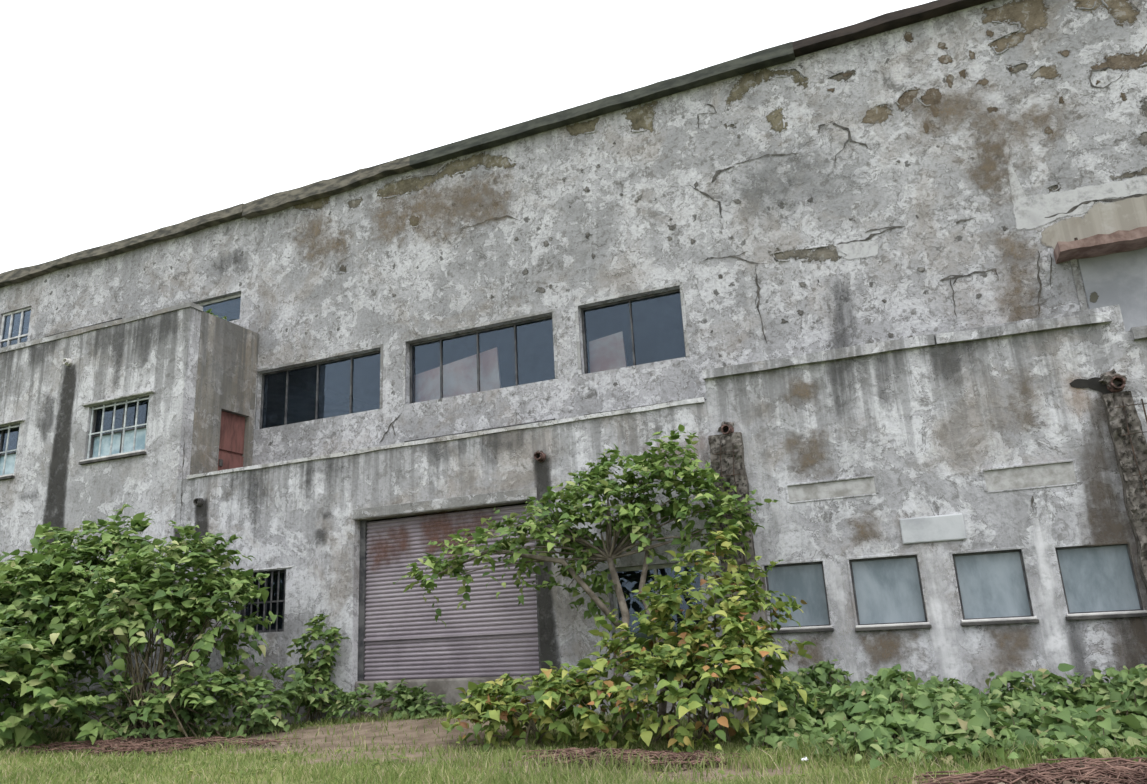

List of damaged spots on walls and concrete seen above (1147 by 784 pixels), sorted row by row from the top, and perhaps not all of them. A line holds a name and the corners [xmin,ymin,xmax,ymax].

spalling [1072,0,1140,27]
spalling [725,68,808,106]
spalling [1091,44,1147,85]
spalling [1119,91,1147,116]
crack [690,121,868,217]
crack [705,252,767,343]
spalling [768,244,847,263]
crack [940,268,998,317]
leakage [42,366,76,554]
leakage [1084,394,1147,670]
leakage [828,549,963,684]
leakage [1032,519,1080,673]